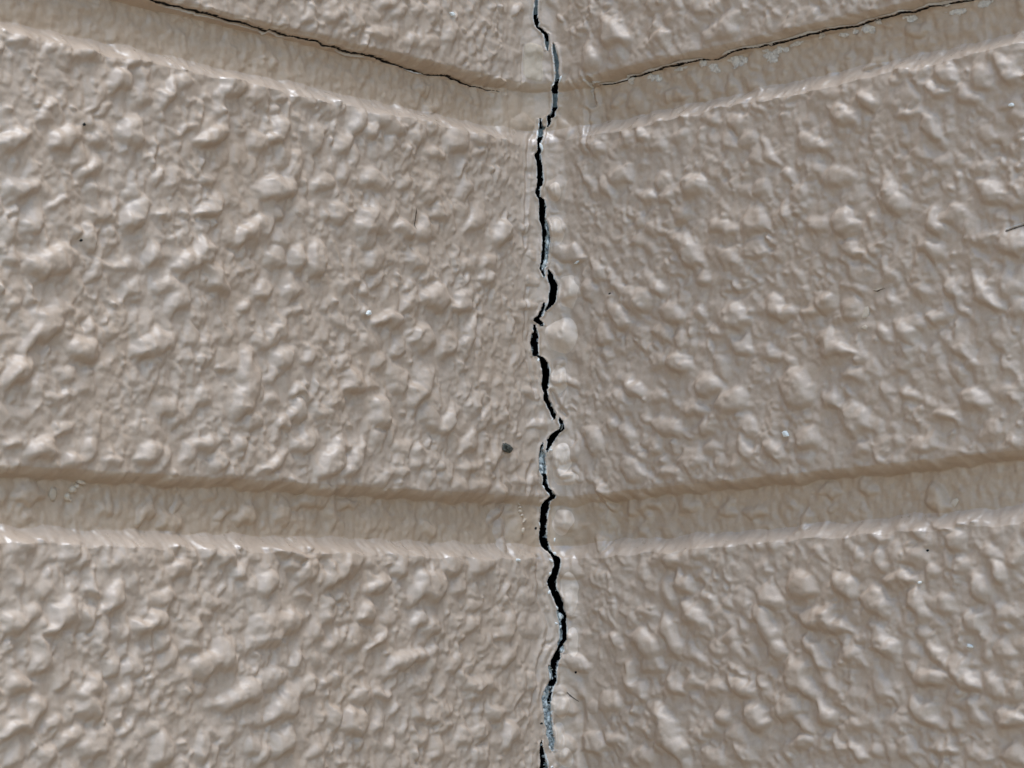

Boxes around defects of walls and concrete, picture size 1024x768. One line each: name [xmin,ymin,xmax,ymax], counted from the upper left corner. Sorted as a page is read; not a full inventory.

crack [150,0,495,91]
crack [598,0,974,85]
crack [530,0,579,768]